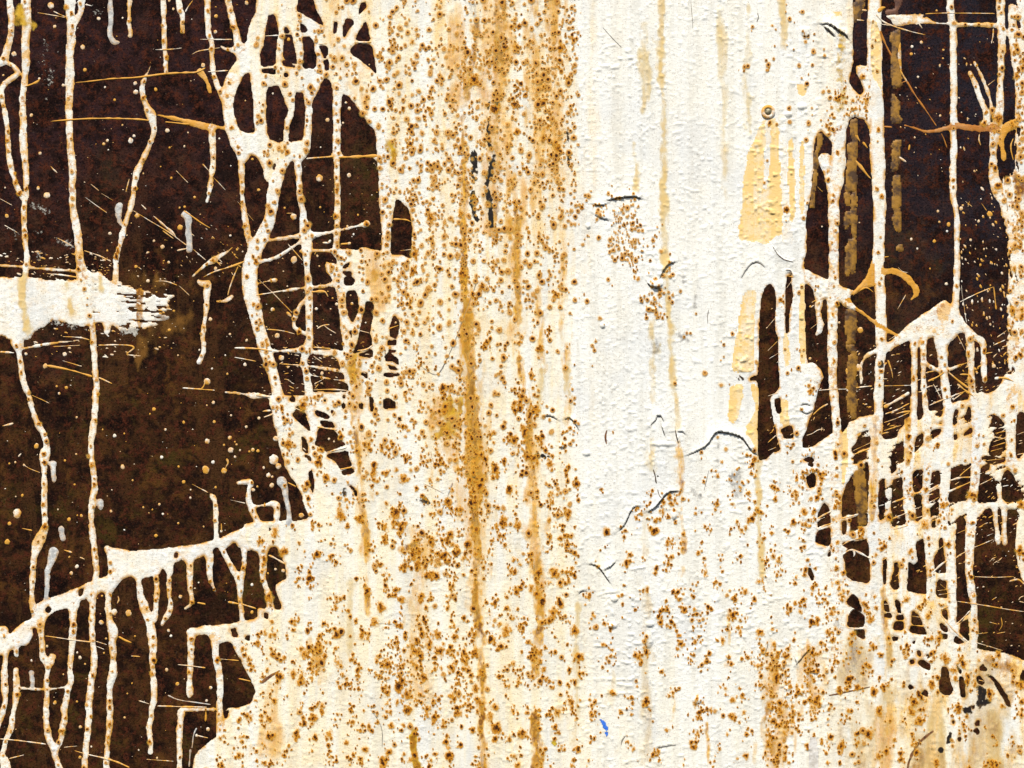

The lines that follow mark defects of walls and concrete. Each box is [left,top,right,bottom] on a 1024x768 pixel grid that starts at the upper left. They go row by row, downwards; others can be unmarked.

peeling [260,14,317,69]
peeling [343,18,377,74]
peeling [233,73,377,160]
corrosion [5,129,28,238]
peeling [343,271,374,354]
corrosion [215,0,1024,768]
peeling [727,275,806,461]
corrosion [37,421,49,543]
peeling [292,410,352,469]
crack [619,469,677,531]
crack [651,412,758,455]
peeling [815,309,1024,660]